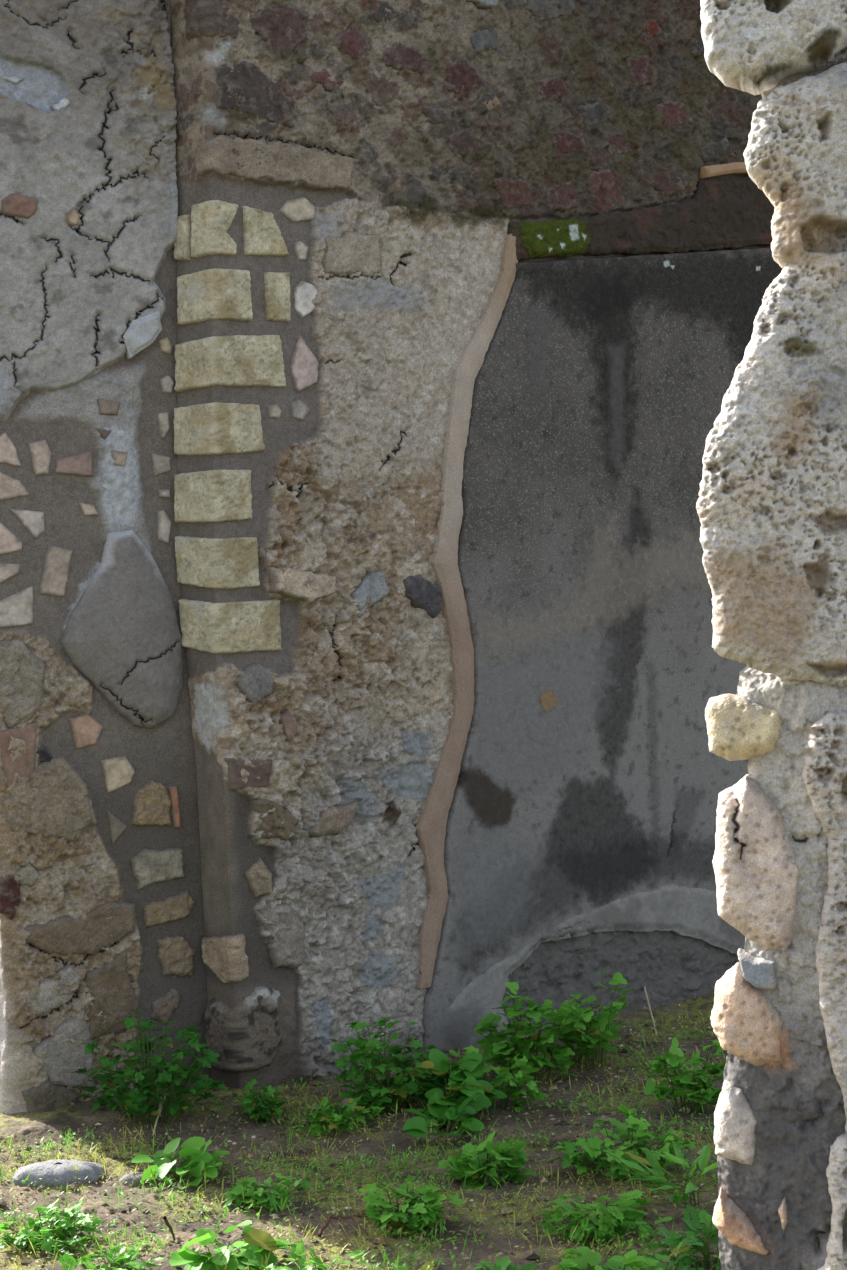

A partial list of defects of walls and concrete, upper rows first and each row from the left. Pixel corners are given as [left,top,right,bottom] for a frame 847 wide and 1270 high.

crack [0,0,165,388]
leakage [518,252,783,477]
crack [100,641,180,726]
leakage [459,769,515,826]
crack [732,793,747,860]